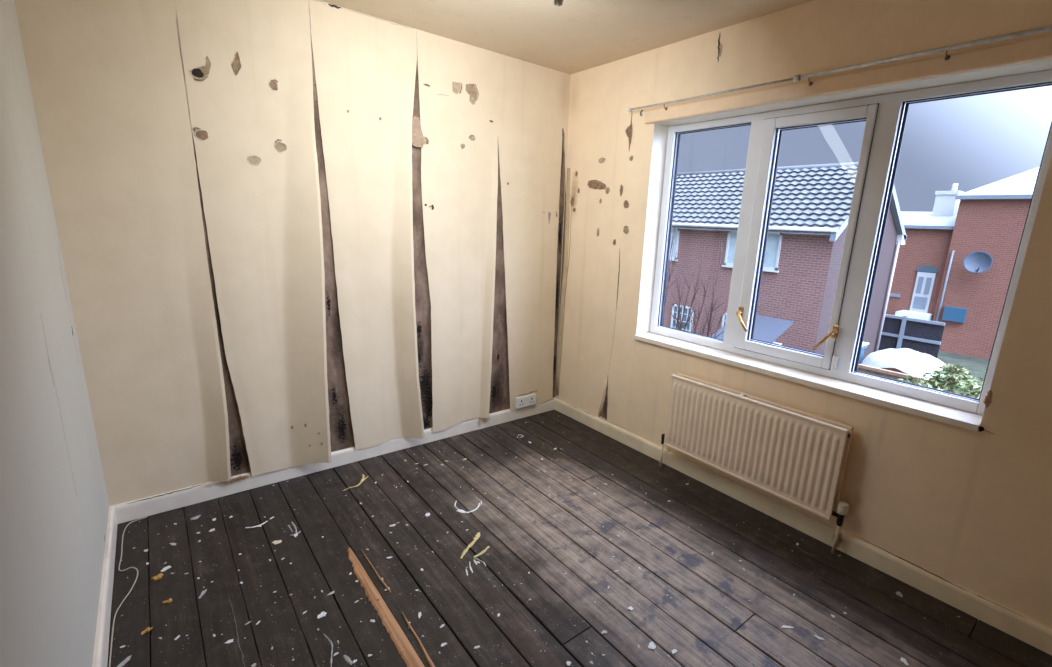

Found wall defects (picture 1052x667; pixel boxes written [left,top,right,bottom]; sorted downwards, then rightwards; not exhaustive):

peeling [177,18,212,81]
peeling [231,51,242,75]
peeling [452,81,479,105]
crack [715,34,723,61]
peeling [247,155,262,166]
peeling [587,180,629,209]
flaking render [309,7,355,452]
flaking render [191,127,251,476]
flaking render [412,137,433,430]
flaking render [489,146,510,414]